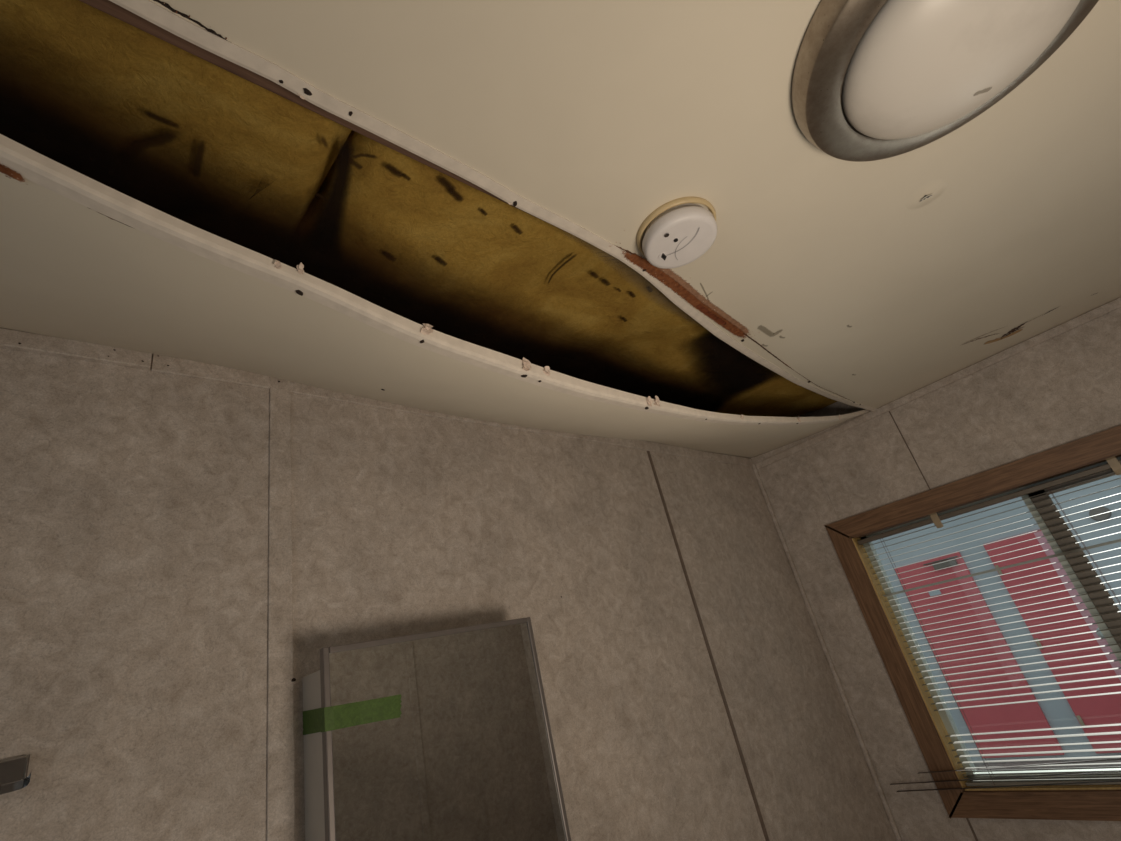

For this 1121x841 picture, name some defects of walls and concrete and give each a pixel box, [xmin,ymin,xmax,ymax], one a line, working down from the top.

peeling [0,164,28,185]
leakage [0,45,778,412]